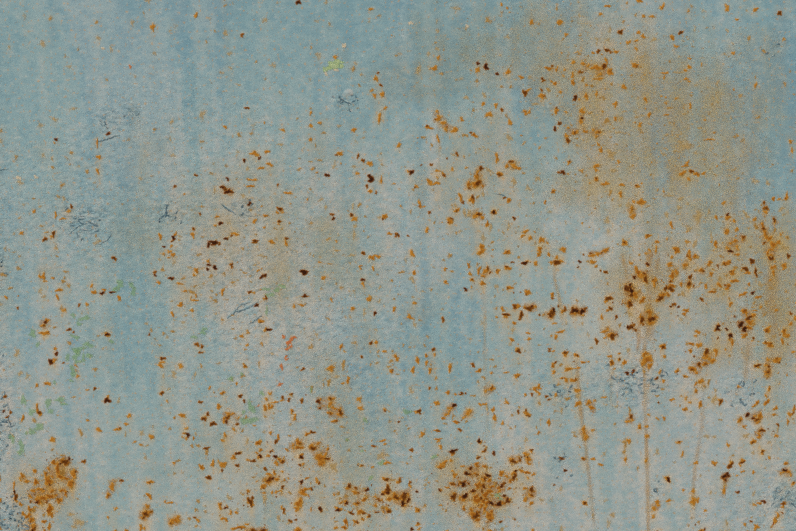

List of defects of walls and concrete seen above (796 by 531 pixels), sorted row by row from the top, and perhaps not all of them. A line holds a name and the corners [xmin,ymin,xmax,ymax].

rust [153,150,296,323]
rust [352,153,382,194]
rust [400,20,796,495]
rust [0,437,86,531]